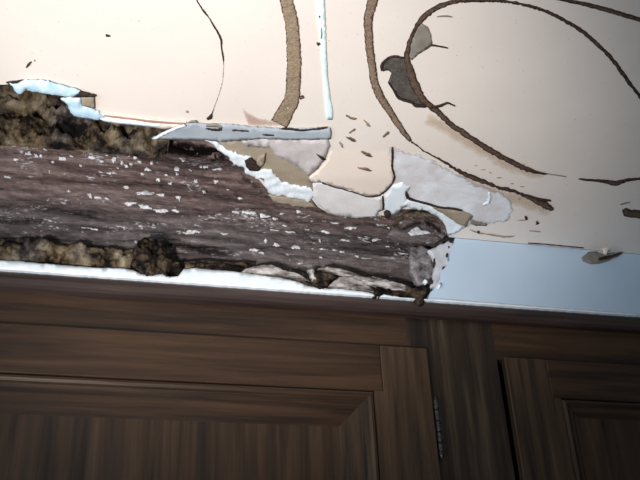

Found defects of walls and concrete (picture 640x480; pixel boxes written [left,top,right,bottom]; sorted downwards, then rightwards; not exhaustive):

crack [196,0,224,65]
peeling [6,79,105,121]
crack [430,101,455,109]
peeling [83,152,153,176]
peeling [125,190,179,213]
flaking render [152,121,513,292]